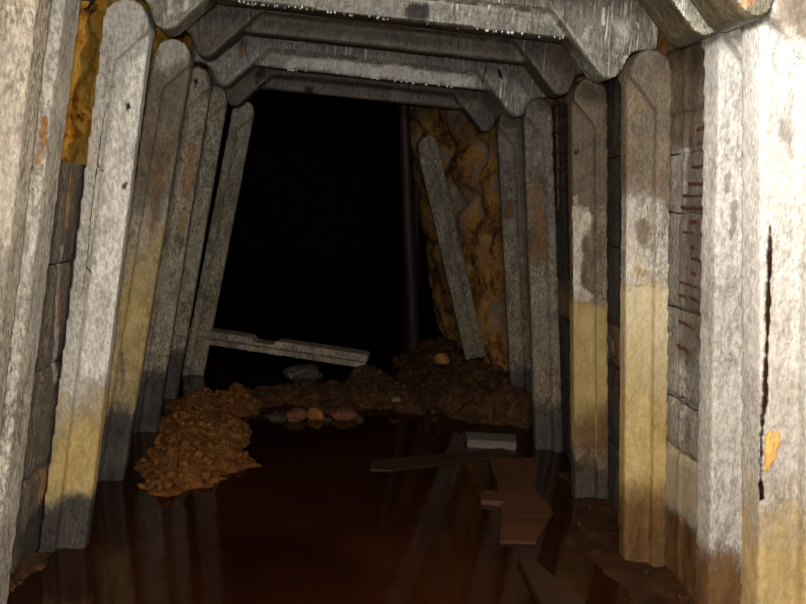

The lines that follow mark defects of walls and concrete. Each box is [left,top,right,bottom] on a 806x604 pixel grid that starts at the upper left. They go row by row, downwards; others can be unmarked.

water stain [286,58,473,86]
water stain [207,0,572,52]
water stain [565,89,608,206]
water stain [618,0,806,201]